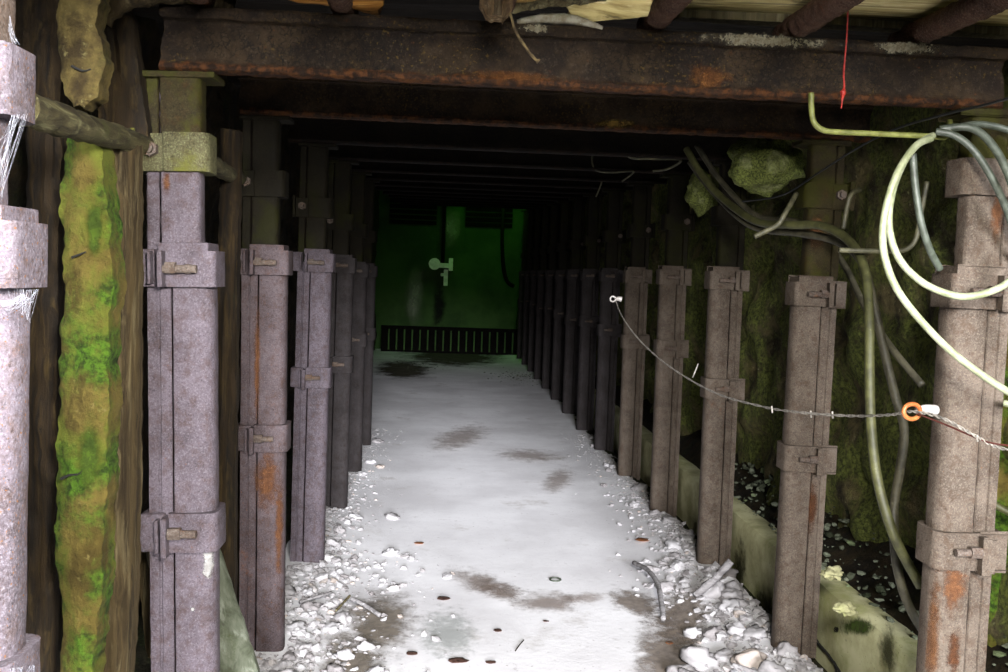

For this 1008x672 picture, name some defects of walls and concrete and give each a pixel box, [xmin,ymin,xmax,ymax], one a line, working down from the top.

rust [255,453,284,574]
leakage [461,574,572,609]
rust [926,570,966,672]